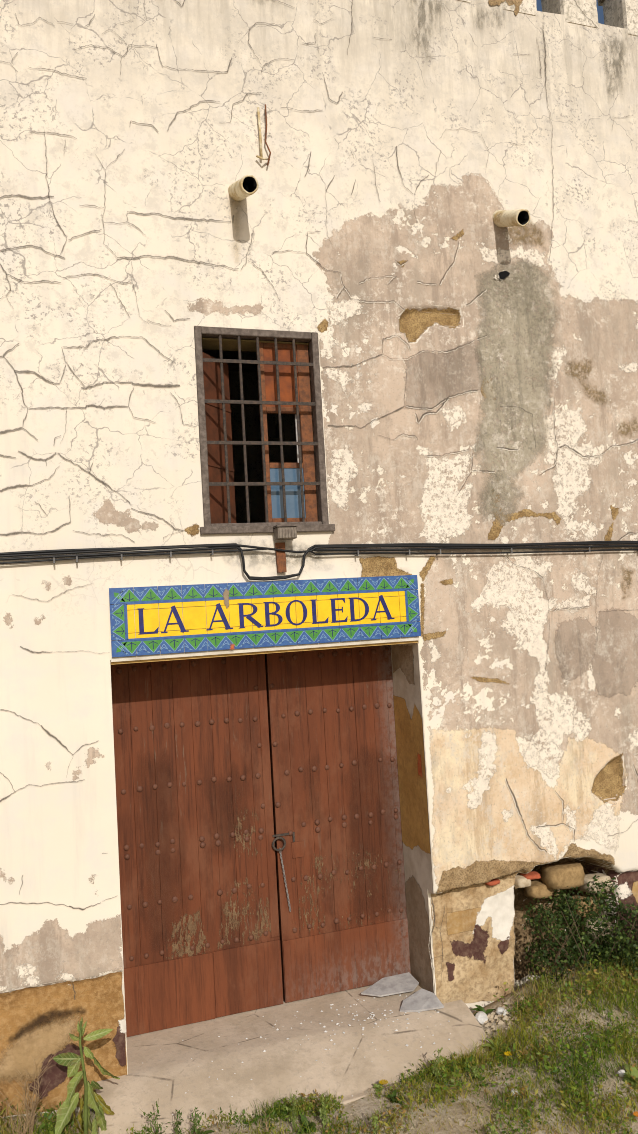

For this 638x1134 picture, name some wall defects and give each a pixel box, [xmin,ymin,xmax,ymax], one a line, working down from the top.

crack [3,0,392,132]
crack [520,27,554,258]
peeling [187,297,264,316]
crack [0,128,638,542]
peeling [92,499,159,533]
peeling [41,575,72,591]
peeling [313,173,638,1004]
crack [0,709,99,802]
crack [0,881,116,910]
flaking render [0,914,127,1117]